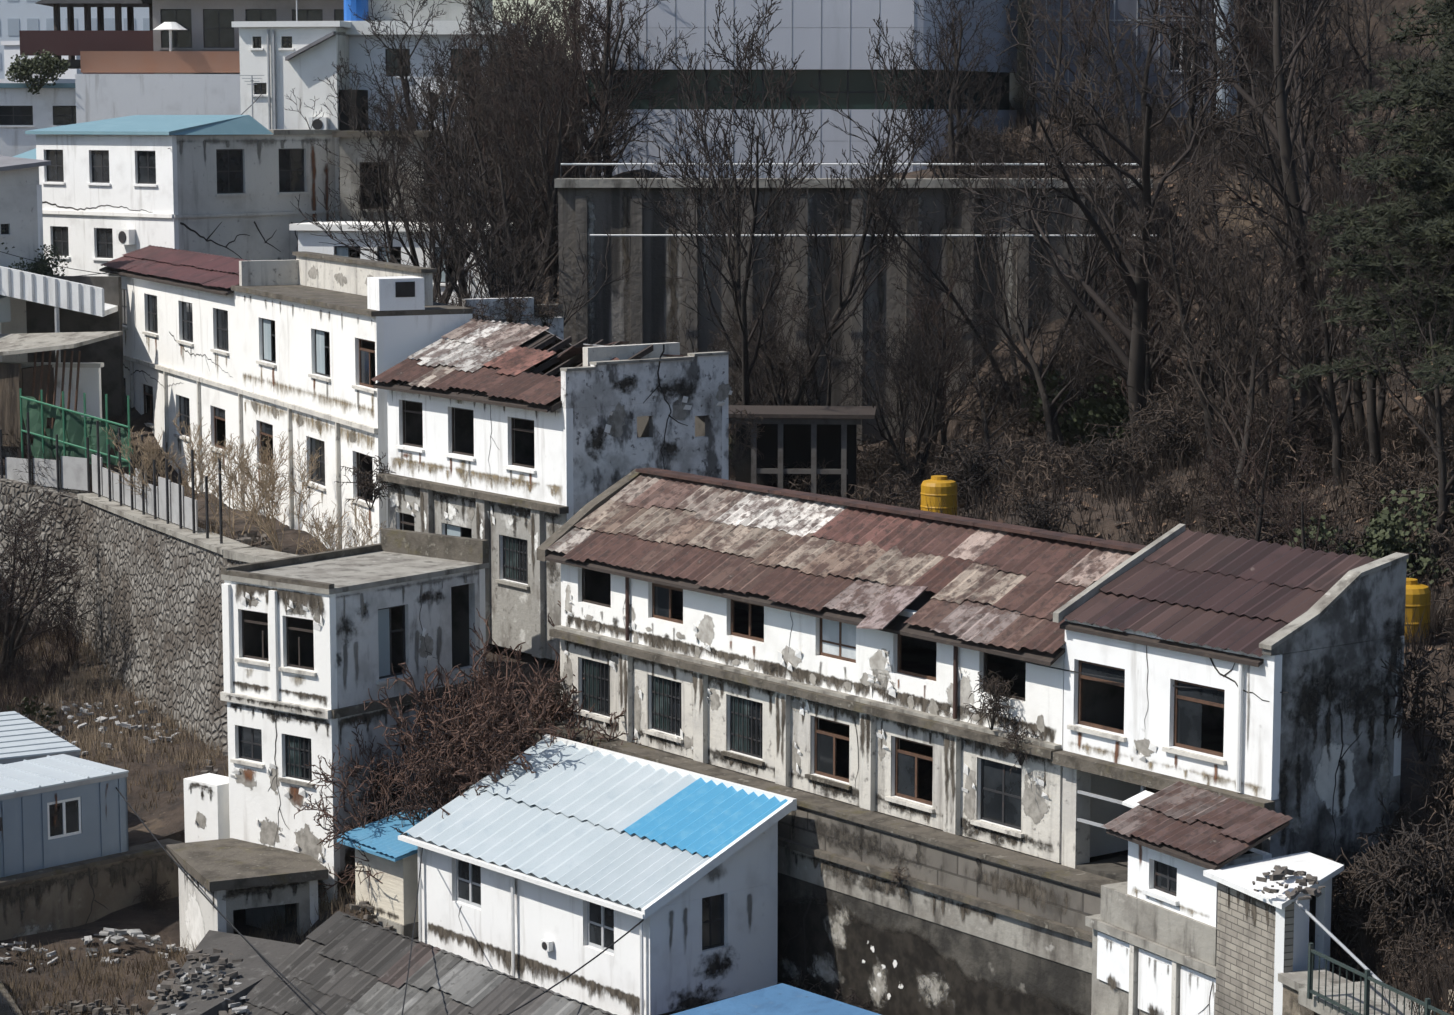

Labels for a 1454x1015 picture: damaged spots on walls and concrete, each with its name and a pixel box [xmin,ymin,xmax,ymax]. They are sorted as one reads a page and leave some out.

peeling [235,584,324,631]
damp [229,670,472,743]
damp [336,594,368,687]
spalling [564,585,1054,743]
damp [1288,620,1411,816]
peeling [230,763,356,906]
peeling [961,763,976,833]
damp [1131,758,1258,796]
damp [1279,755,1301,846]
damp [428,923,640,1015]
spalling [869,966,886,1004]
spalling [918,975,949,1006]